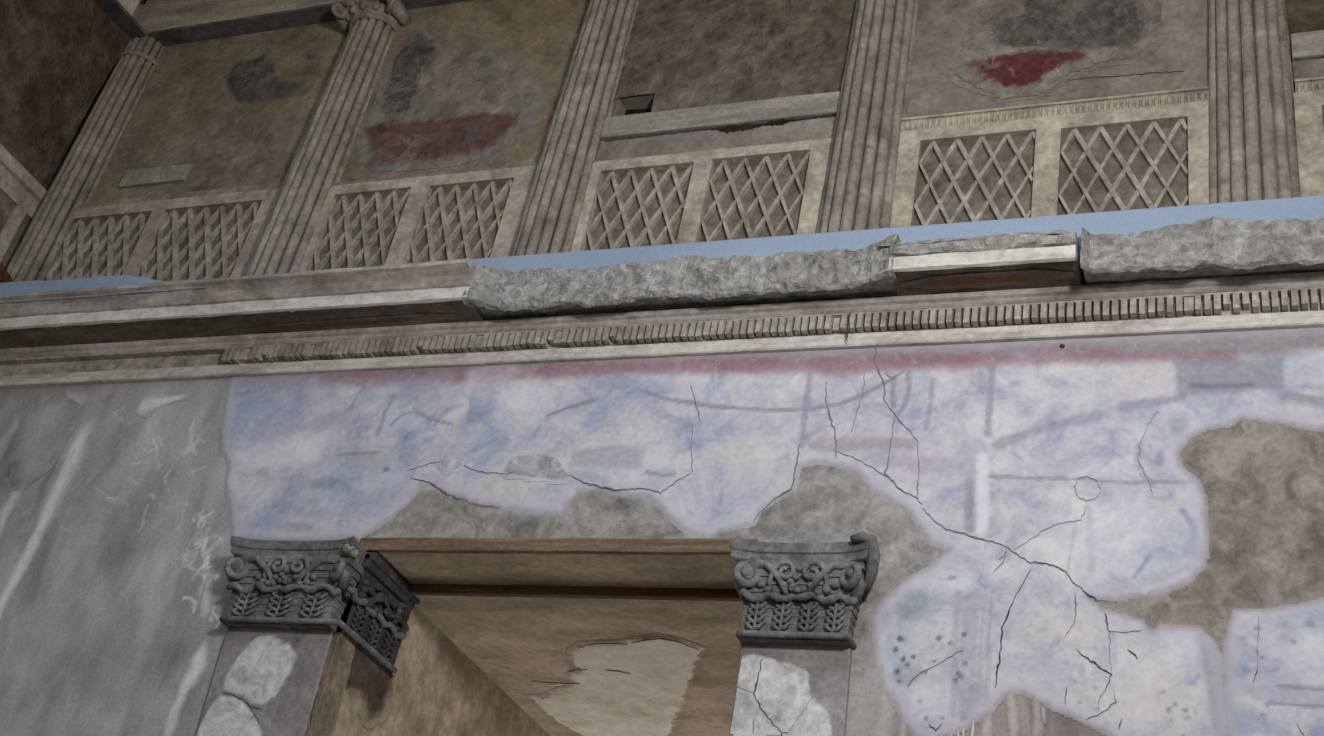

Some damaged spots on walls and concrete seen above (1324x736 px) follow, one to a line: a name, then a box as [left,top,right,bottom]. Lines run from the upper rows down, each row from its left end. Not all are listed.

water stain [0,382,234,736]
crack [407,461,514,508]
flaking render [342,449,696,558]
crack [566,390,700,494]
crack [753,444,800,522]
flaking render [715,465,942,696]
crack [825,313,1141,728]
flaking render [1103,421,1324,651]
peeling [524,633,708,736]
crack [738,658,813,736]
water stain [950,692,1047,736]